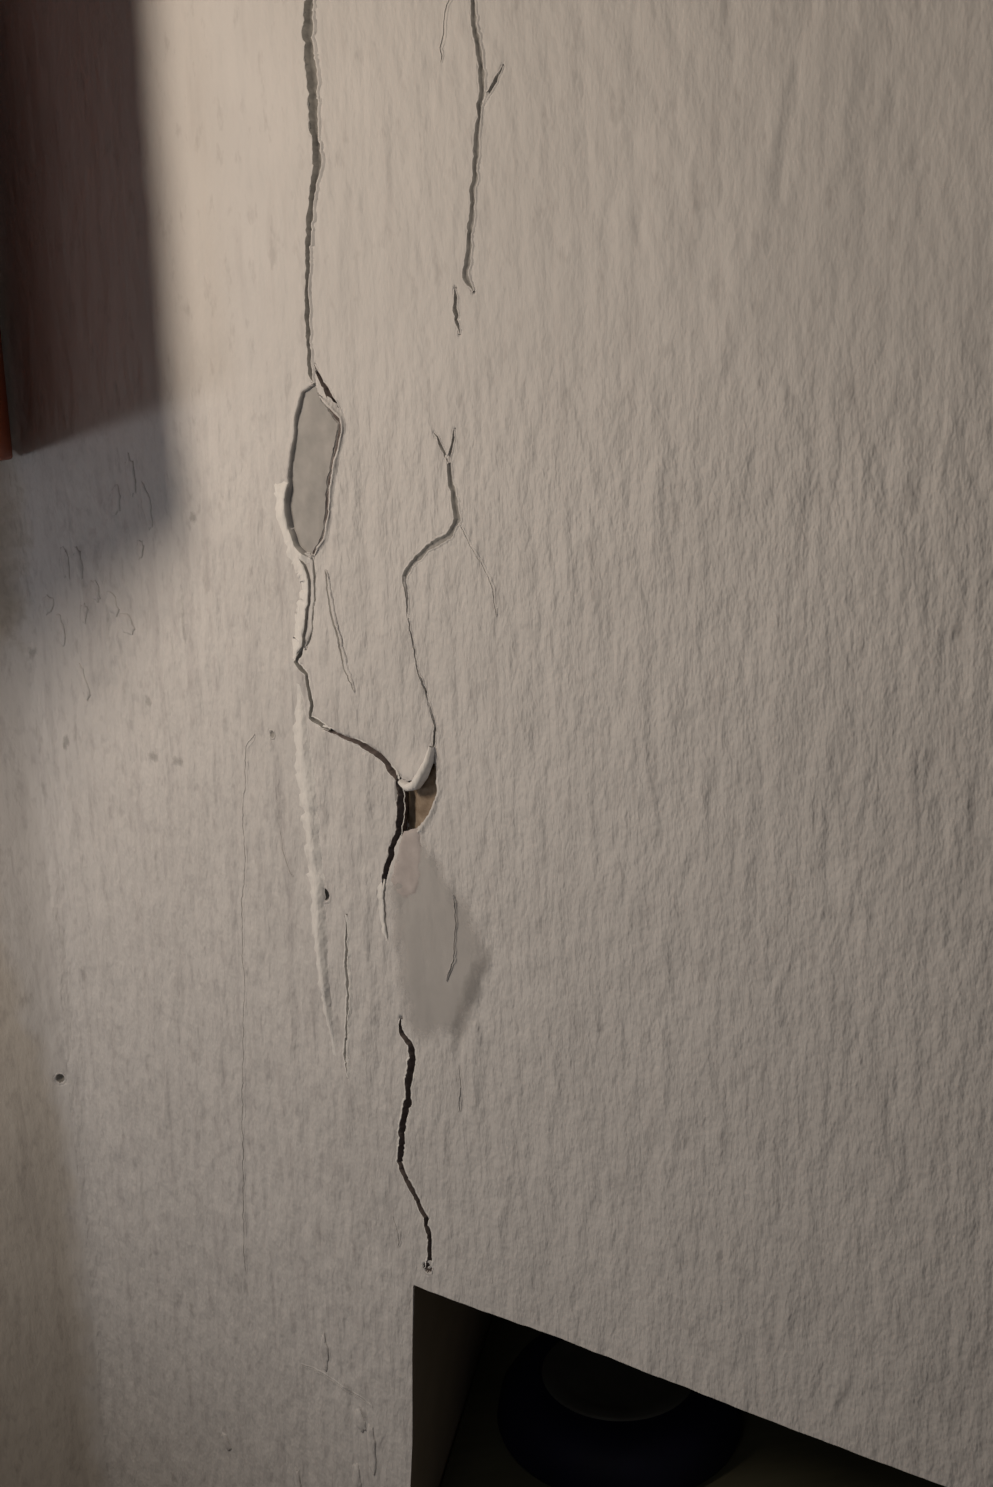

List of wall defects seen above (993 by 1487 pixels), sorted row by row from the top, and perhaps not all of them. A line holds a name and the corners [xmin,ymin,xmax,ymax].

crack [300,0,343,413]
crack [439,0,505,334]
flaking render [274,380,443,897]
crack [401,428,498,618]
crack [342,914,353,1078]
crack [392,1018,434,1276]